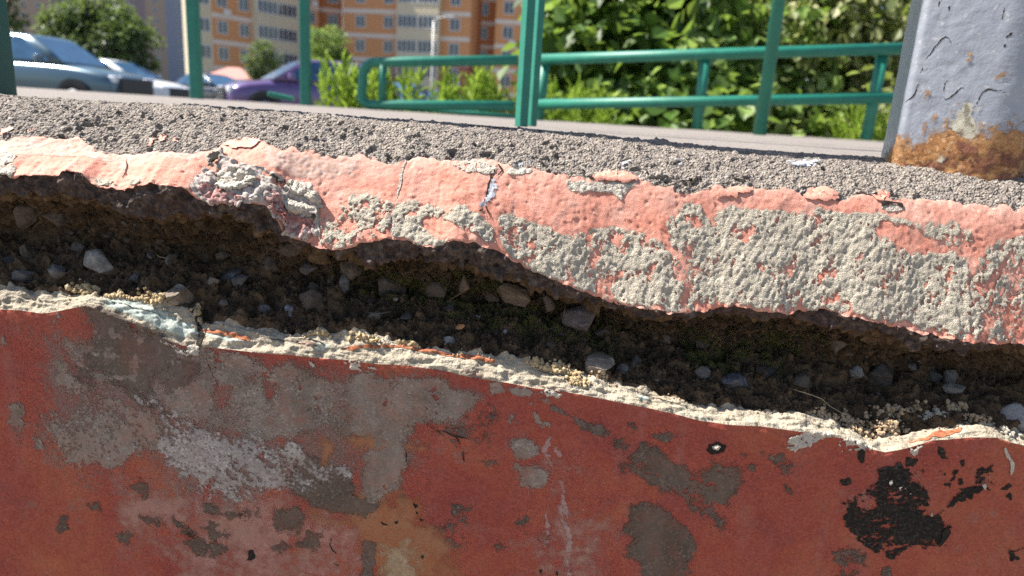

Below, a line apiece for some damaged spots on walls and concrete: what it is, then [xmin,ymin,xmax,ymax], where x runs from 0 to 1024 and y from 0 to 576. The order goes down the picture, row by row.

crack [907,36,950,101]
crack [943,80,1002,104]
corrosion [884,102,1024,182]
crack [391,160,406,238]
crack [479,164,503,218]
spalling [0,146,1024,525]